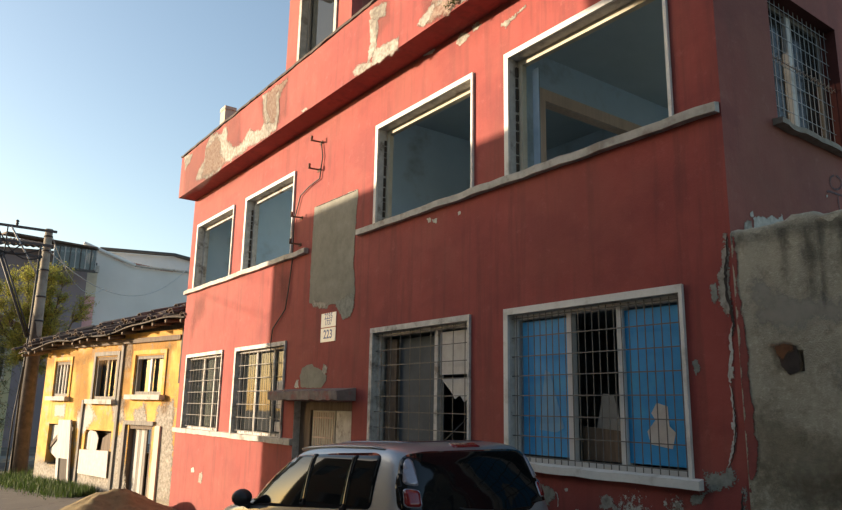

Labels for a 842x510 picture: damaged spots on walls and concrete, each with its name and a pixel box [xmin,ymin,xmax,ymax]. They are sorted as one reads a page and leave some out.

flaking render [417,0,468,27]
flaking render [353,2,400,76]
peeling [456,21,482,46]
flaking render [196,78,288,181]
crack [709,233,737,468]
spalling [779,345,800,375]
peeling [294,364,327,388]
flaking render [54,403,66,418]
flaking render [76,393,177,503]
flaking render [33,459,55,480]
peeling [599,491,652,510]
peeling [663,466,748,510]